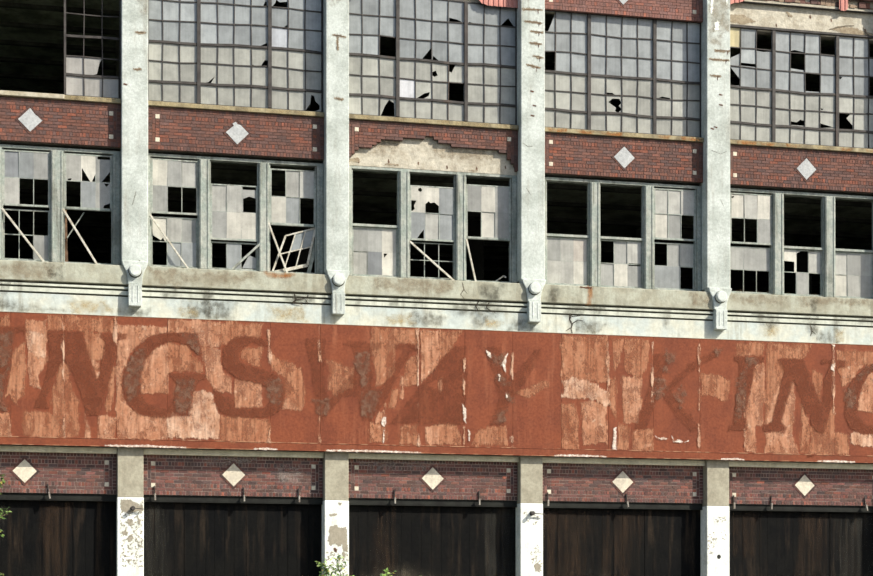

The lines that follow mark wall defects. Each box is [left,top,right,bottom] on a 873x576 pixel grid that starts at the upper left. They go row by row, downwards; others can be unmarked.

spalling [349,136,517,175]
peeling [120,499,143,567]
peeling [326,503,349,575]